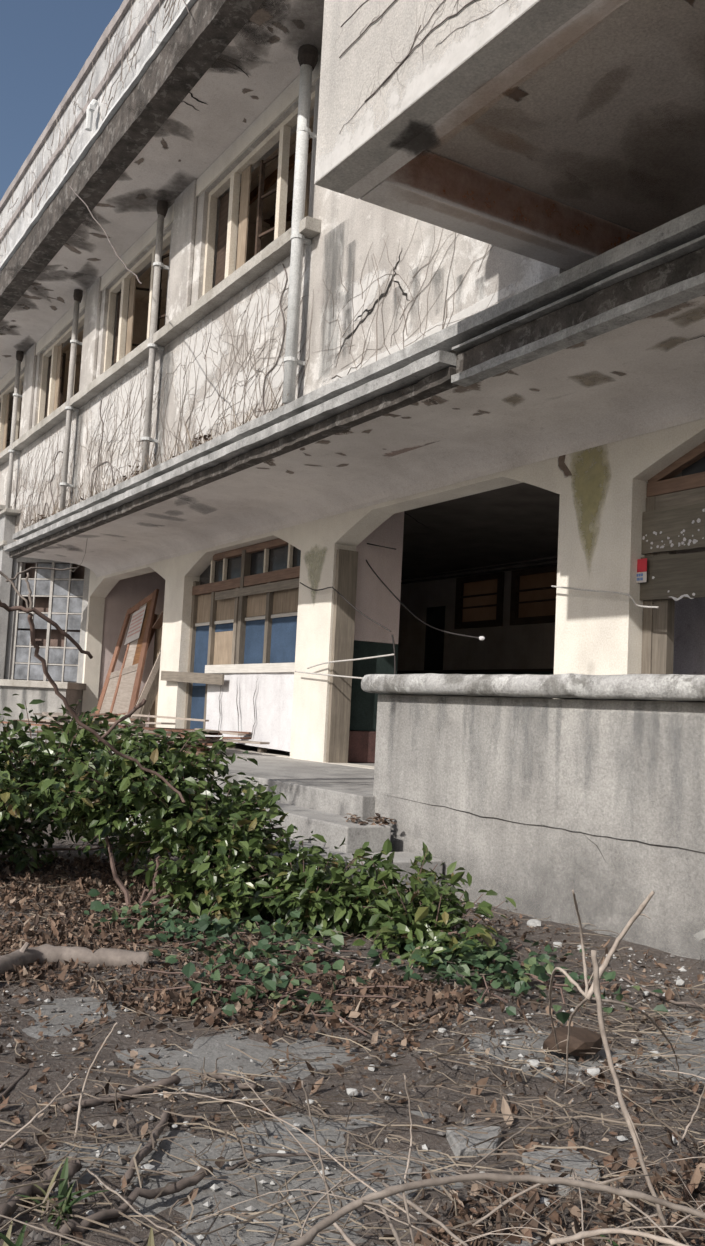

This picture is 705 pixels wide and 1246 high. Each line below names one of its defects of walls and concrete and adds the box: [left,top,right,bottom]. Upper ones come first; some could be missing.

water stain [286,0,324,51]
water stain [161,176,189,208]
corrosion [410,152,639,254]
water stain [573,446,608,555]
crack [382,794,704,862]